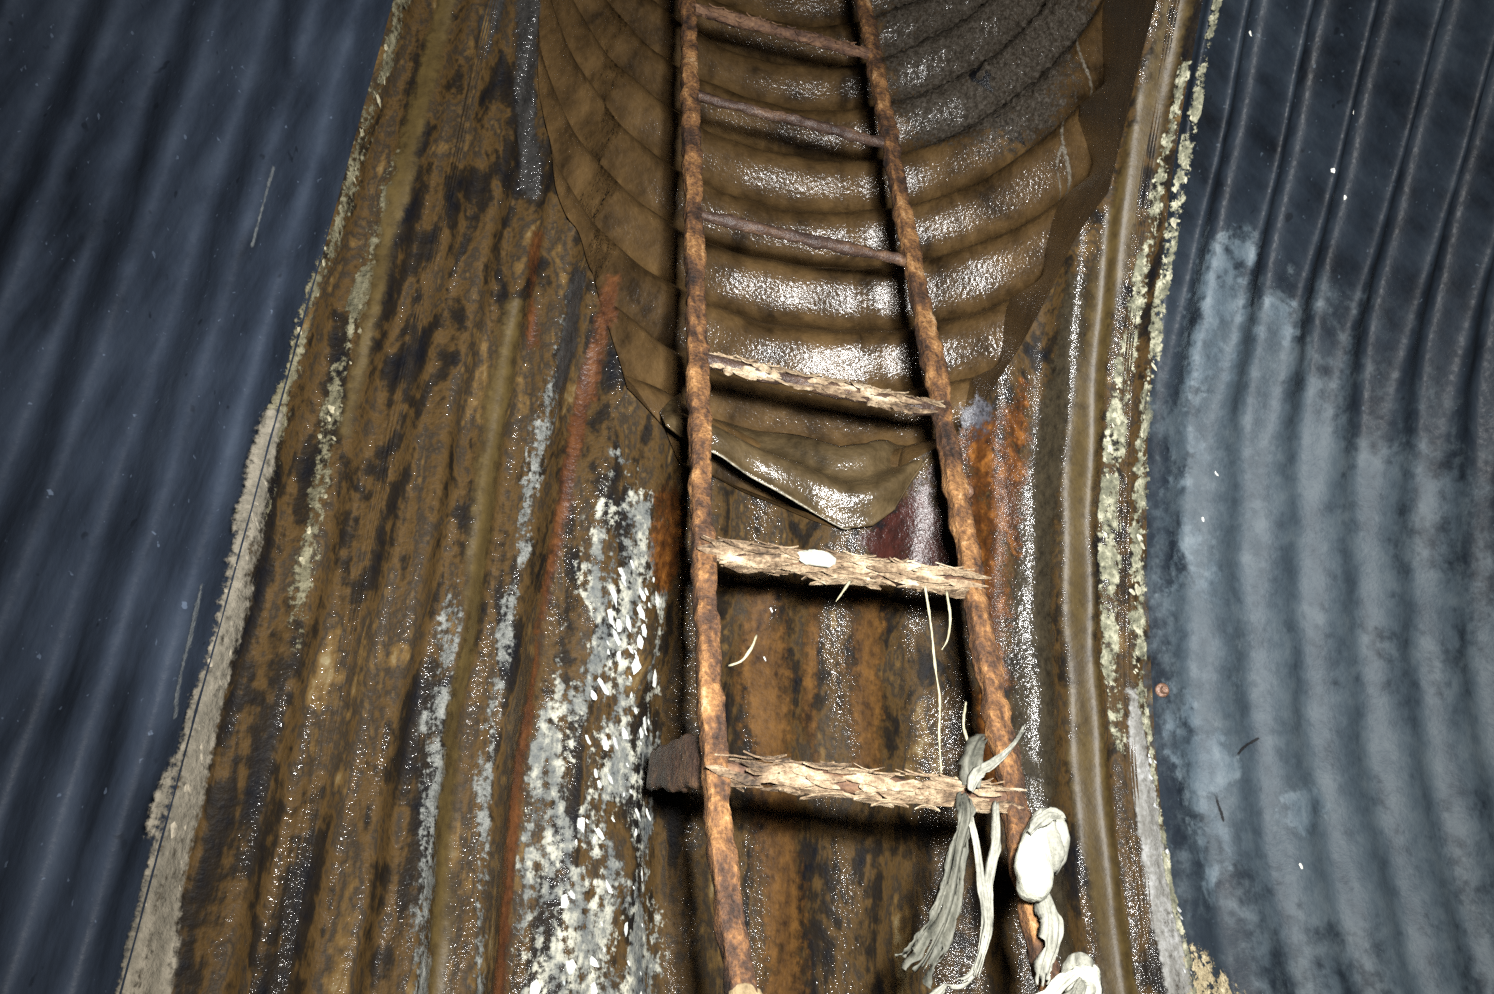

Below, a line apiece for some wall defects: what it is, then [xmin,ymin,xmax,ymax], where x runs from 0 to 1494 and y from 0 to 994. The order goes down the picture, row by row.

corrosion [525,230,543,348]
corrosion [650,488,688,594]
corrosion [858,467,955,566]
corrosion [958,378,1031,687]
damp [1010,0,1494,994]
corrosion [494,274,620,994]
corrosion [970,688,998,785]